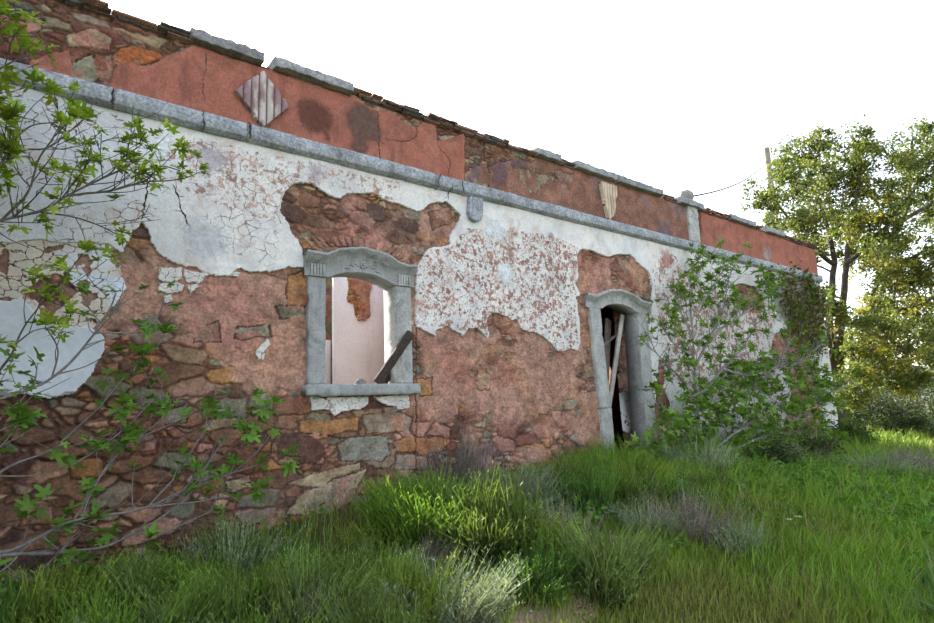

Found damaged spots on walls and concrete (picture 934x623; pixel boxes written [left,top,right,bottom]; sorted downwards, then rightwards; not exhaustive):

leakage [299,100,332,140]
leakage [348,103,380,153]
crack [0,88,298,268]
crack [377,111,464,199]
spalling [464,161,494,187]
flaking render [0,239,126,328]
flaking render [158,267,240,303]
peeling [417,228,579,351]
flaking render [255,339,271,360]
flaking render [309,395,410,416]